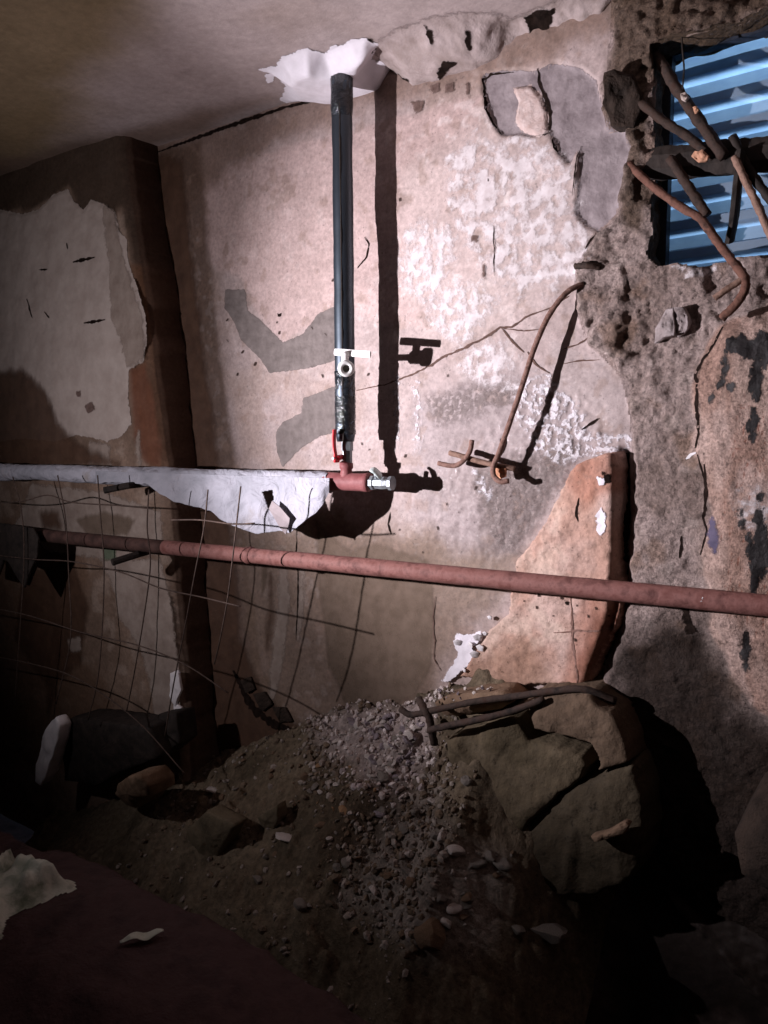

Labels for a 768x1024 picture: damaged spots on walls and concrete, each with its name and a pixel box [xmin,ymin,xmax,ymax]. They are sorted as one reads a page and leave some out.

rust [692,149,710,163]
peeling [0,189,147,442]
crack [356,296,595,391]
spalling [258,0,768,942]
peeling [15,483,183,715]